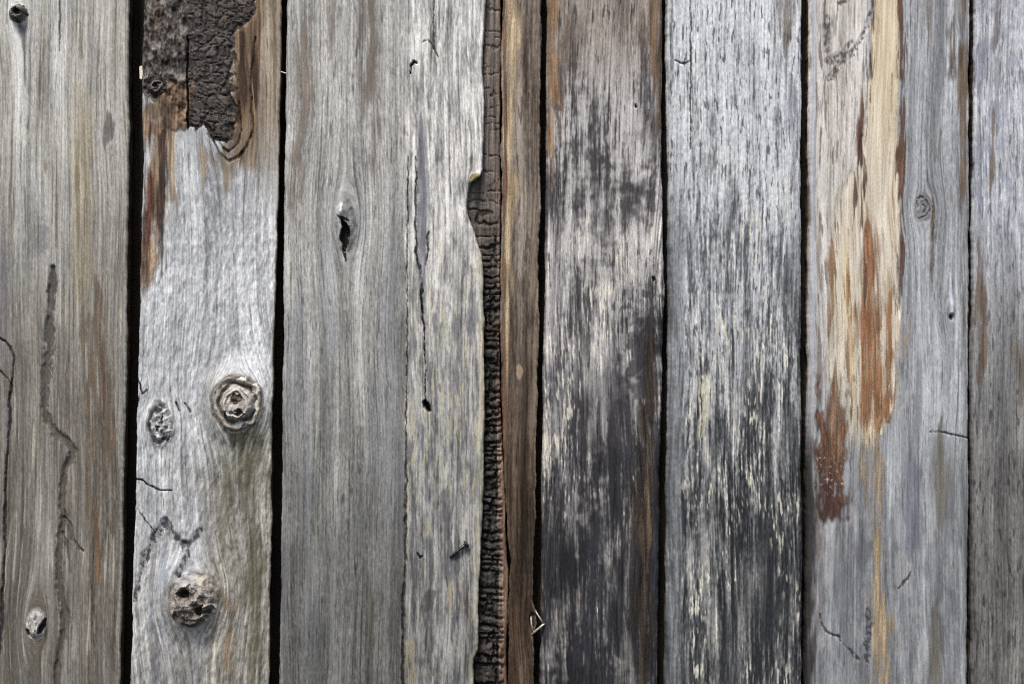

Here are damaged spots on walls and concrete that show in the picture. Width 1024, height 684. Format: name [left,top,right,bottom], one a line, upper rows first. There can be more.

crack [0,338,15,652]
crack [41,265,84,684]
crack [401,167,431,684]